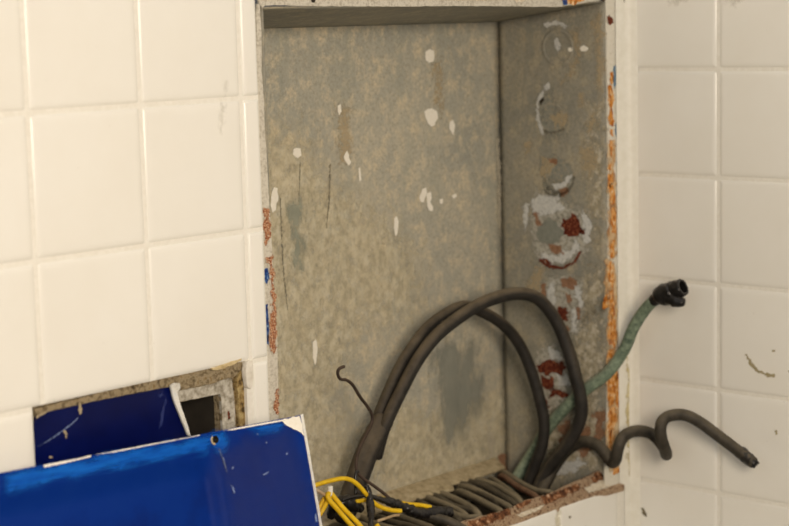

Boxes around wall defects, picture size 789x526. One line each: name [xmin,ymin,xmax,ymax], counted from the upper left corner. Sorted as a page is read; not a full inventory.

rust [263,208,272,246]
rust [602,72,618,364]
rust [265,254,278,354]
spalling [32,358,304,467]
rust [605,372,619,450]
rust [467,499,531,526]
spalling [516,504,546,518]
rust [541,484,580,504]
spalling [584,480,609,493]
rust [591,466,620,483]